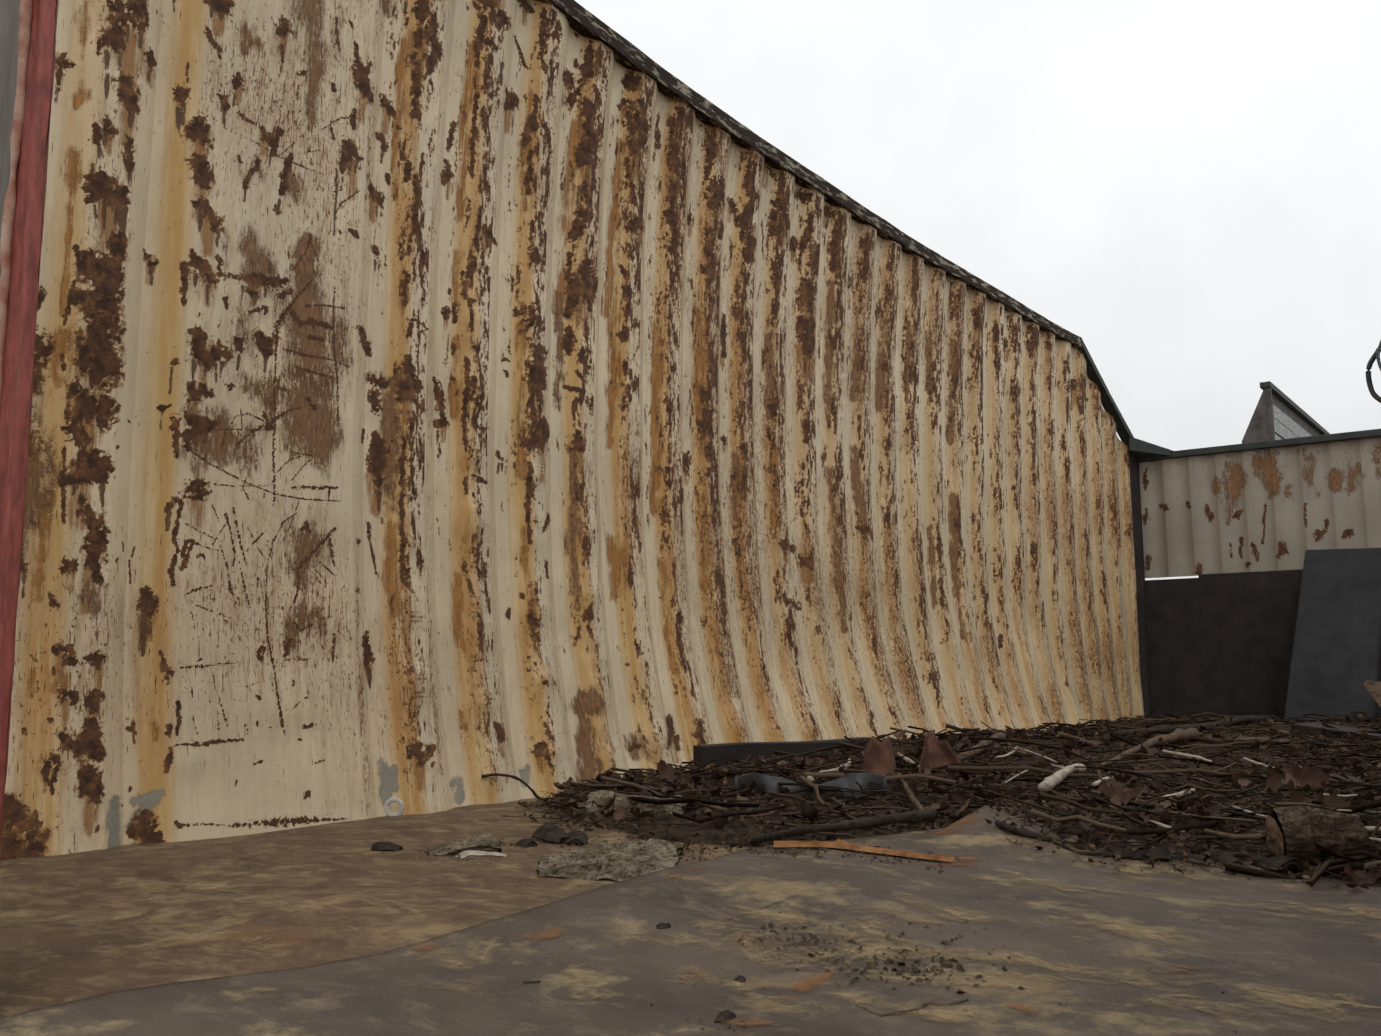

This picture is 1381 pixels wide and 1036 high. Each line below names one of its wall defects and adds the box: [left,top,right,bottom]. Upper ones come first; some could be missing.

rust [21,0,489,689]
rust [440,0,843,611]
rust [850,304,1106,445]
rust [825,446,870,634]
rust [1186,441,1381,569]
rust [0,793,58,861]
rust [28,639,107,836]
rust [125,700,182,773]
rust [126,809,183,844]
rust [405,741,437,790]
rust [565,687,651,783]
rust [666,713,706,763]